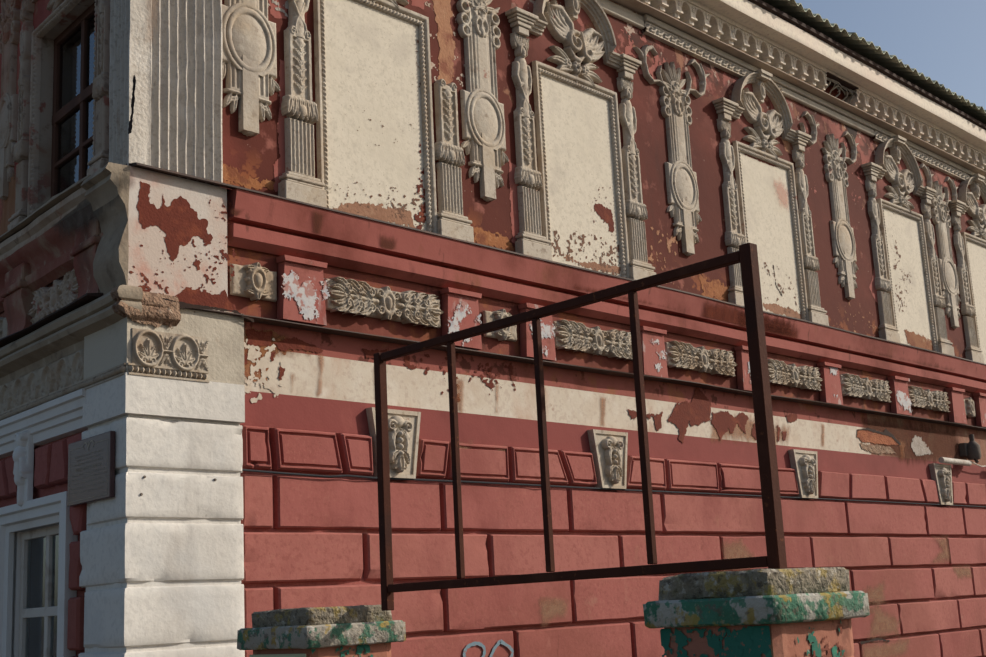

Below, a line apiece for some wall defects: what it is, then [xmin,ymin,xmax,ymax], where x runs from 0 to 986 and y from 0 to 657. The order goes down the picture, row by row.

peeling [129,181,238,313]
peeling [281,270,330,320]
peeling [244,327,323,403]
peeling [628,387,756,443]
peeling [774,413,797,441]
spalling [857,430,899,455]
spalling [911,435,933,456]
peeling [335,644,373,657]
peeling [660,625,772,657]
peeling [795,620,845,657]